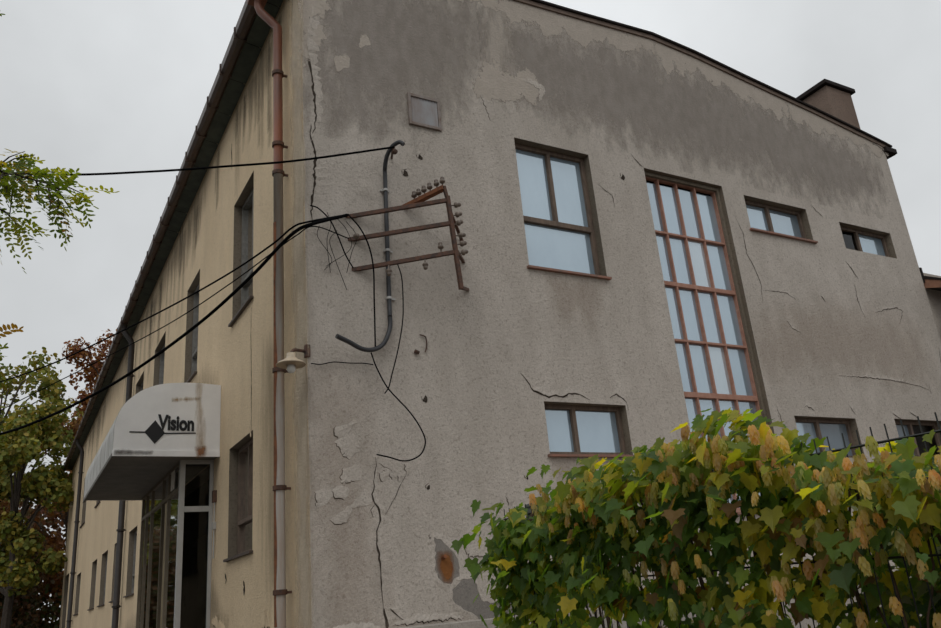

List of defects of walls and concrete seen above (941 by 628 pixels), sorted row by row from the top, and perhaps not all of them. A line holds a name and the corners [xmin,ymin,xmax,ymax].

crack [307,6,332,226]
water stain [317,0,880,199]
flaking render [451,0,883,158]
flaking render [291,0,374,628]
crack [521,372,629,410]
crack [370,457,407,628]
spalling [328,531,517,628]